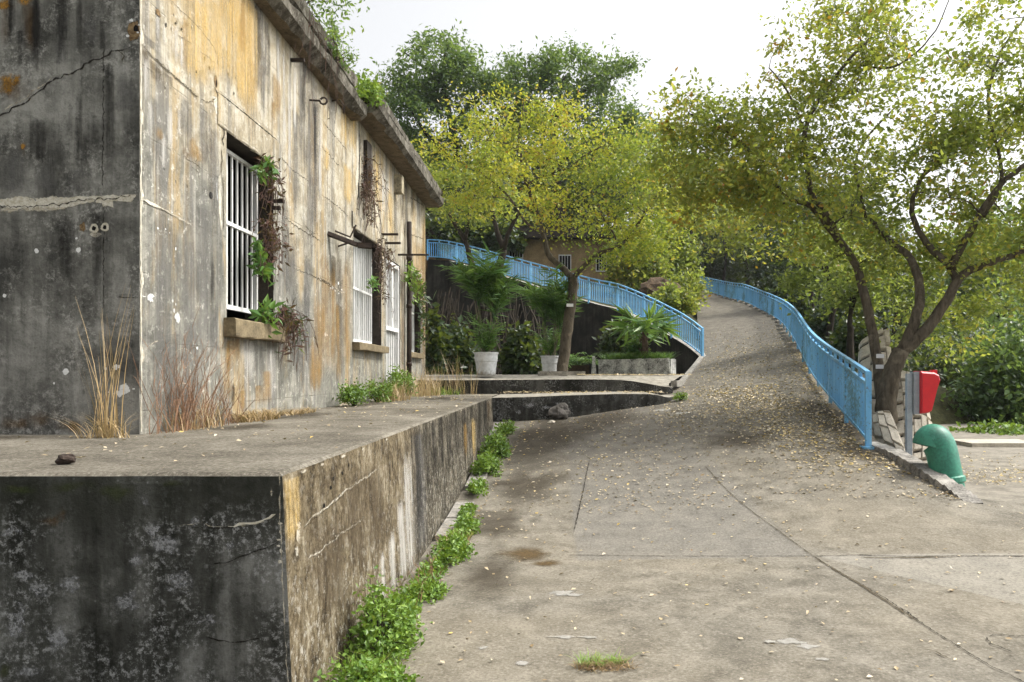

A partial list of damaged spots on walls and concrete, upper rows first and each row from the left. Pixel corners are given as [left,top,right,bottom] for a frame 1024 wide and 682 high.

damp [9,0,40,58]
damp [256,4,321,221]
crack [0,34,348,307]
crack [188,514,278,564]
crack [302,469,378,558]
damp [317,403,486,609]
damp [506,549,556,566]
crack [208,636,259,644]